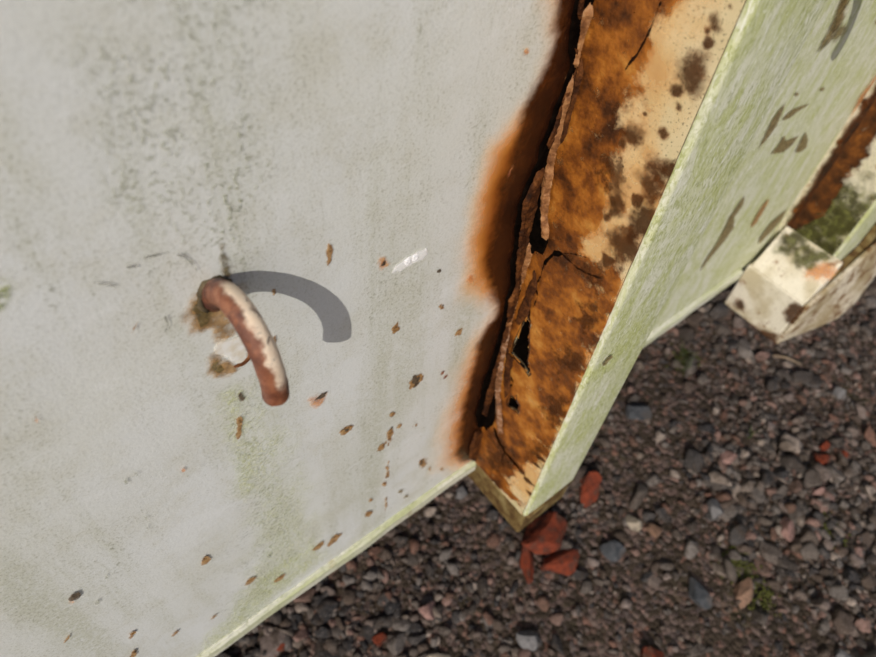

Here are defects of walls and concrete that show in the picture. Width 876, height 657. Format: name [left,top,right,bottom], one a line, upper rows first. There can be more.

crack [625,1,661,70]
corrosion [821,0,850,49]
peeling [760,92,808,147]
peeling [771,132,808,154]
corrosion [786,77,876,231]
crack [469,0,600,469]
corrosion [451,0,680,505]
peeling [700,197,744,271]
peeling [751,200,787,244]
leakage [793,184,876,256]
corrosion [185,303,250,377]